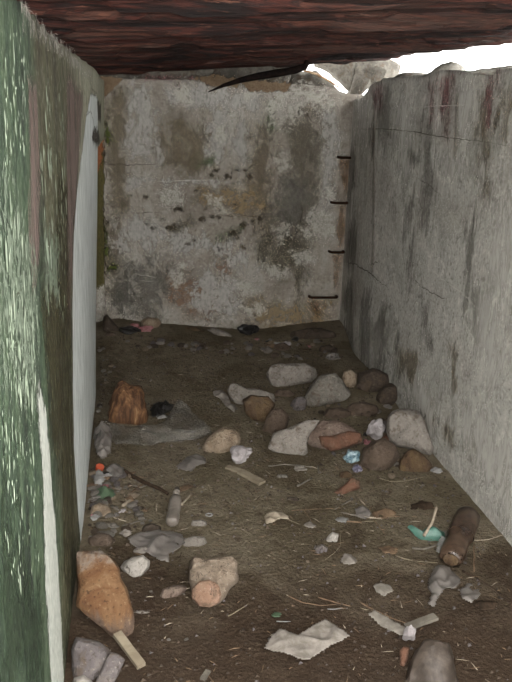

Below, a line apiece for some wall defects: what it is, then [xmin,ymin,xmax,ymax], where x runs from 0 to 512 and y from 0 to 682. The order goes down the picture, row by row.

leakage [0,76,343,682]